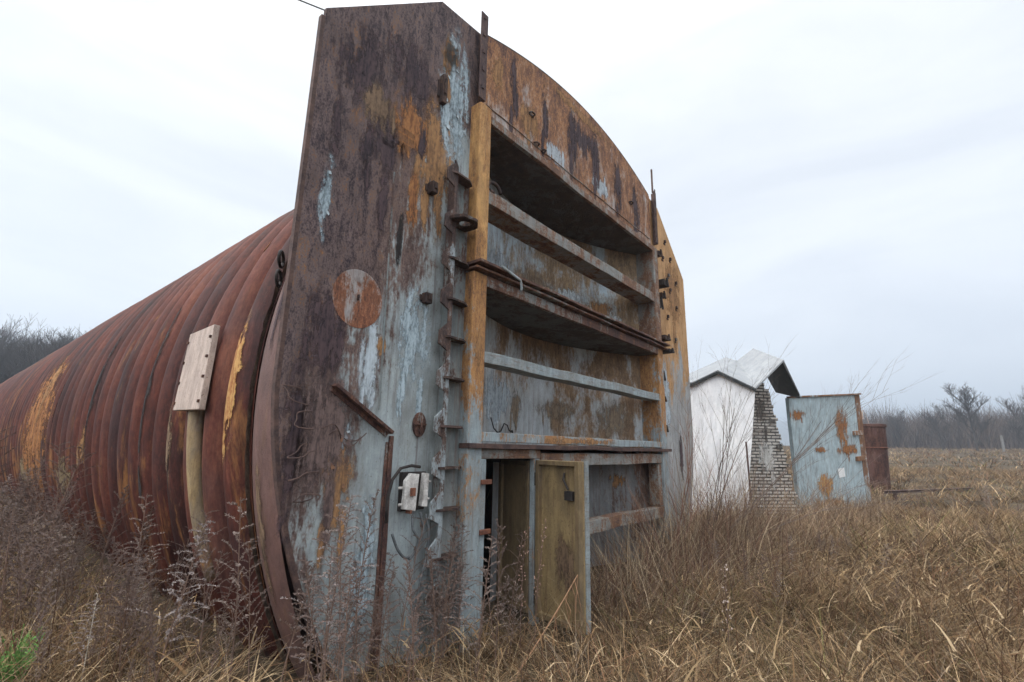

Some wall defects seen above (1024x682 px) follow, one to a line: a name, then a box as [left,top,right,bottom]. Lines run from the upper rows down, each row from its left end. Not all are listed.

peeling [319,155,333,231]
rust [330,22,458,240]
peeling [440,36,469,163]
rust [509,59,519,133]
rust [541,88,613,200]
leakage [592,177,608,198]
rust [614,163,640,233]
rust [22,362,74,492]
peeling [222,322,248,455]
peeling [396,289,431,417]
rust [815,407,857,462]
peeling [349,496,377,629]